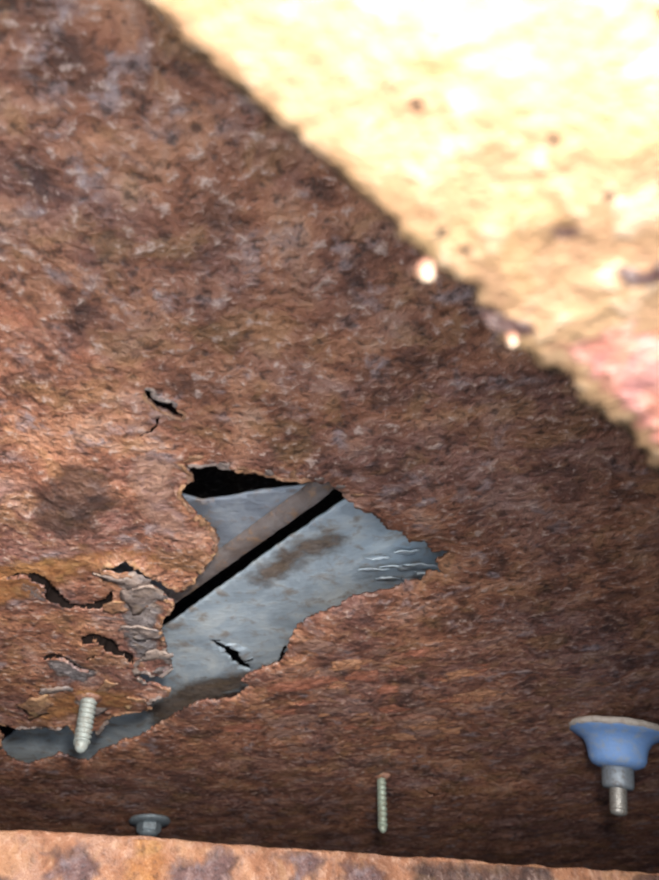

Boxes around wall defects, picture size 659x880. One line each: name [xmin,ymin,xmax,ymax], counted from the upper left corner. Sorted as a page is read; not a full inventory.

corrosion [617,264,659,286]
corrosion [482,309,536,336]
corrosion [563,324,659,442]
corrosion [36,467,115,536]
corrosion [252,535,342,582]
corrosion [358,549,440,580]
corrosion [0,554,174,677]
crack [216,641,255,667]
corrosion [16,660,248,724]
corrosion [220,638,429,753]
corrosion [45,846,98,880]
corrosion [127,839,236,880]